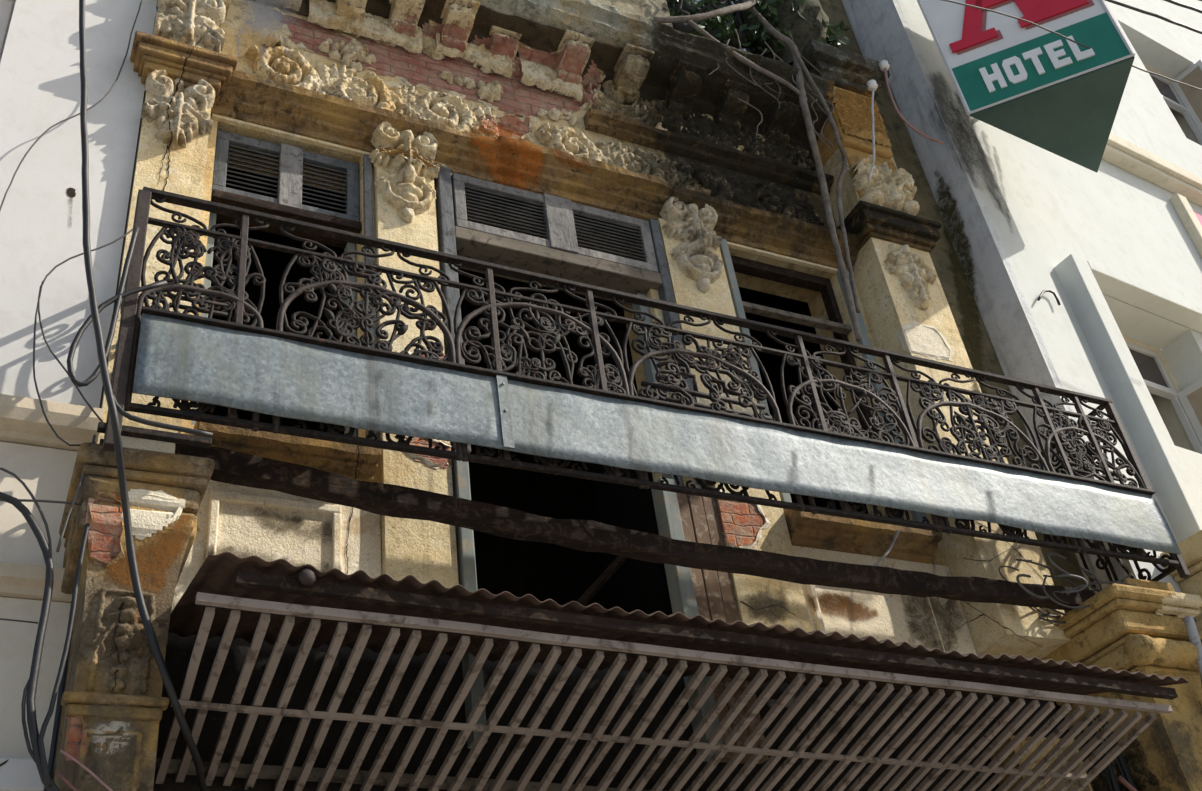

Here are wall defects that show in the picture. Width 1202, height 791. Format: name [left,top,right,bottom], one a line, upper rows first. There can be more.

flaking render [273,8,606,140]
crack [157,38,202,191]
corrosion [471,124,590,201]
leakage [931,76,1002,209]
flaking render [82,489,186,569]
flaking render [696,484,771,550]
leakage [748,589,787,623]
flaking render [64,715,92,767]
leakage [1051,733,1145,791]
leakage [1150,720,1198,790]